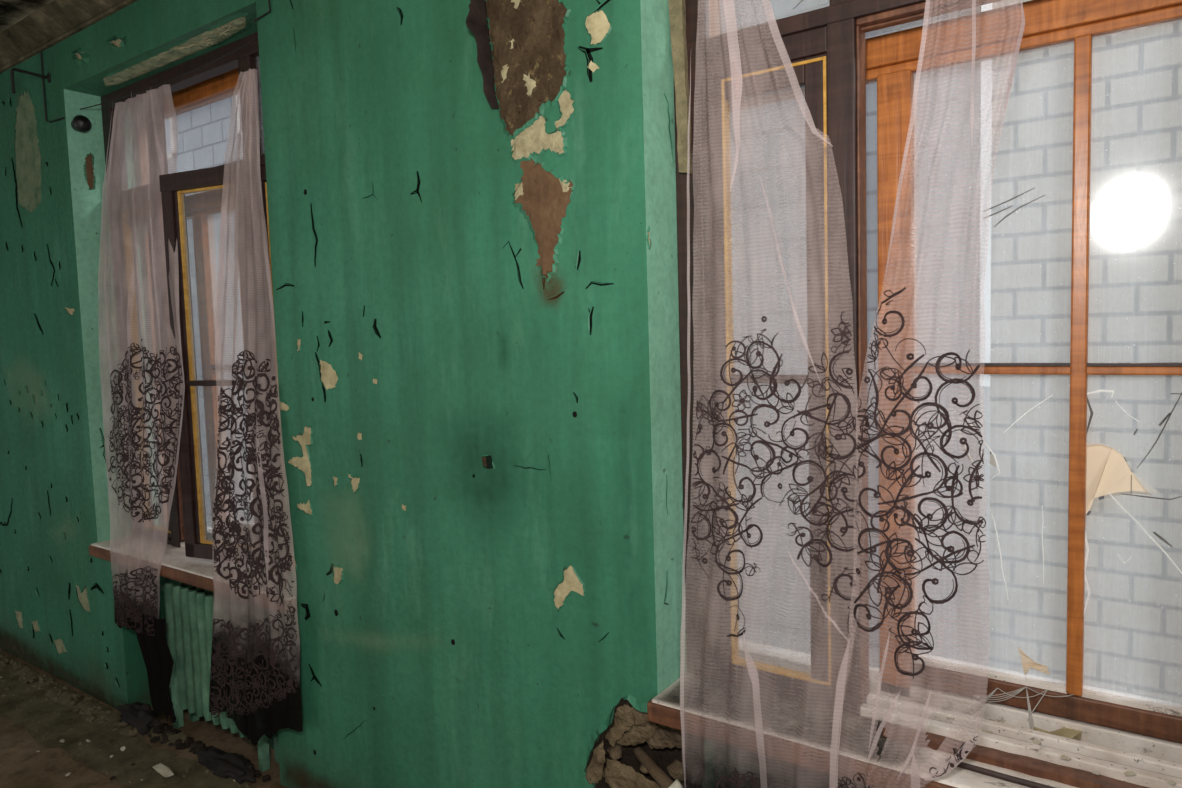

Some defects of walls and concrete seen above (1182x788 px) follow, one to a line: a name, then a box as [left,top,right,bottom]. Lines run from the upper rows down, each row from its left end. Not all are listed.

water stain [0,0,42,26]
peeling [585,8,612,47]
flaking render [466,0,576,283]
peeling [319,359,339,390]
peeling [288,426,314,515]
peeling [333,472,360,493]
peeling [553,565,586,612]
spalling [584,694,704,788]